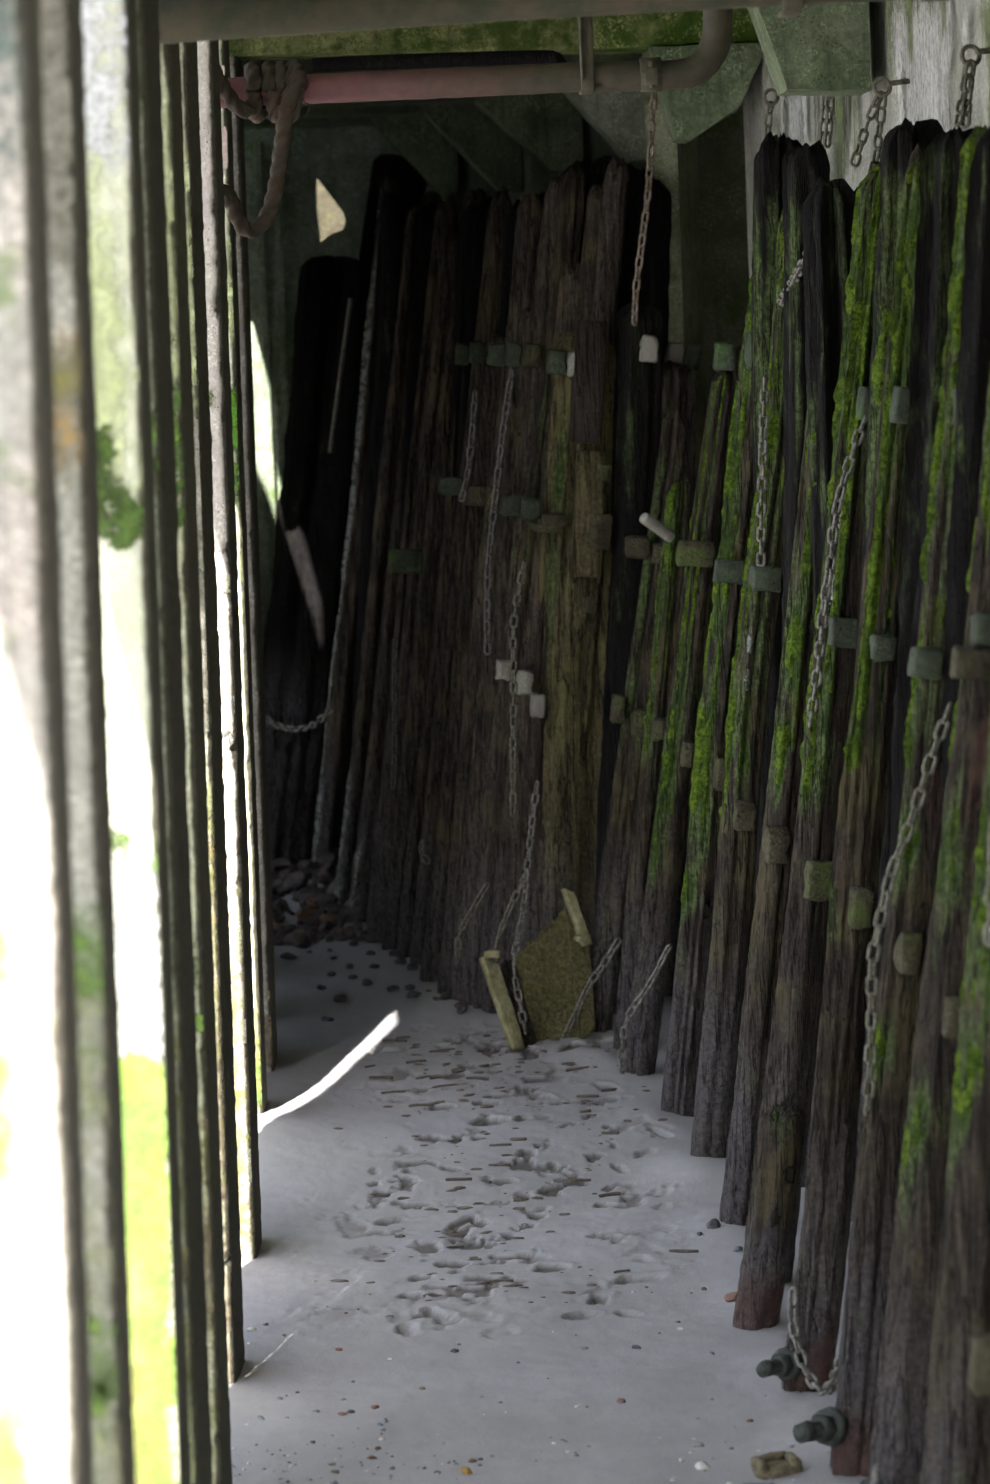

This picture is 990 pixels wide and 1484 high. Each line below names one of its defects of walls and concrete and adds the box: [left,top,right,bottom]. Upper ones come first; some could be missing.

damp [132,1367,142,1401]
damp [134,1418,160,1484]